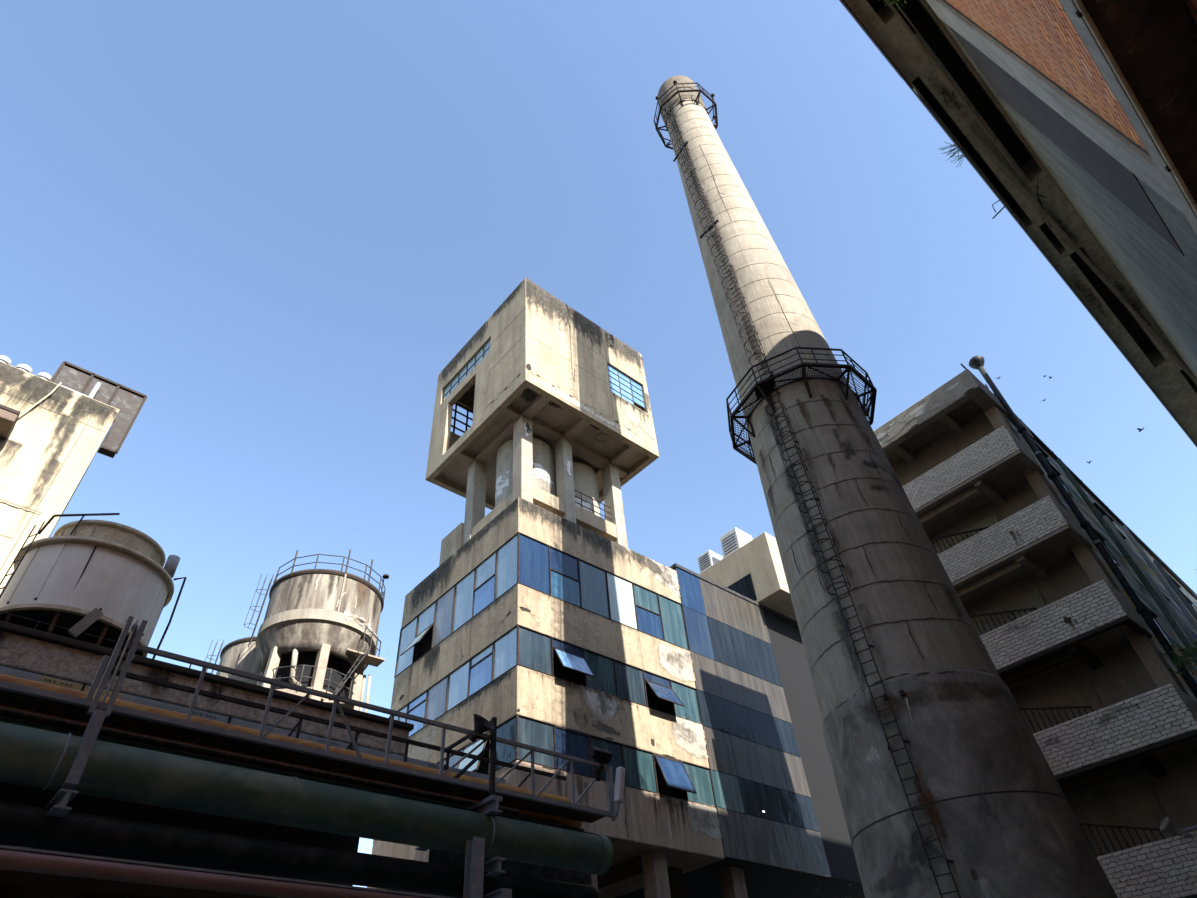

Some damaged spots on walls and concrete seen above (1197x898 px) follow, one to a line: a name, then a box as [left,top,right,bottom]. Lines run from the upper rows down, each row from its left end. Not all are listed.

leakage [439,278,643,377]
leakage [0,361,118,503]
leakage [411,470,662,607]
leakage [358,582,380,616]
peeling [657,642,696,682]
peeling [572,685,620,740]
peeling [632,716,709,759]